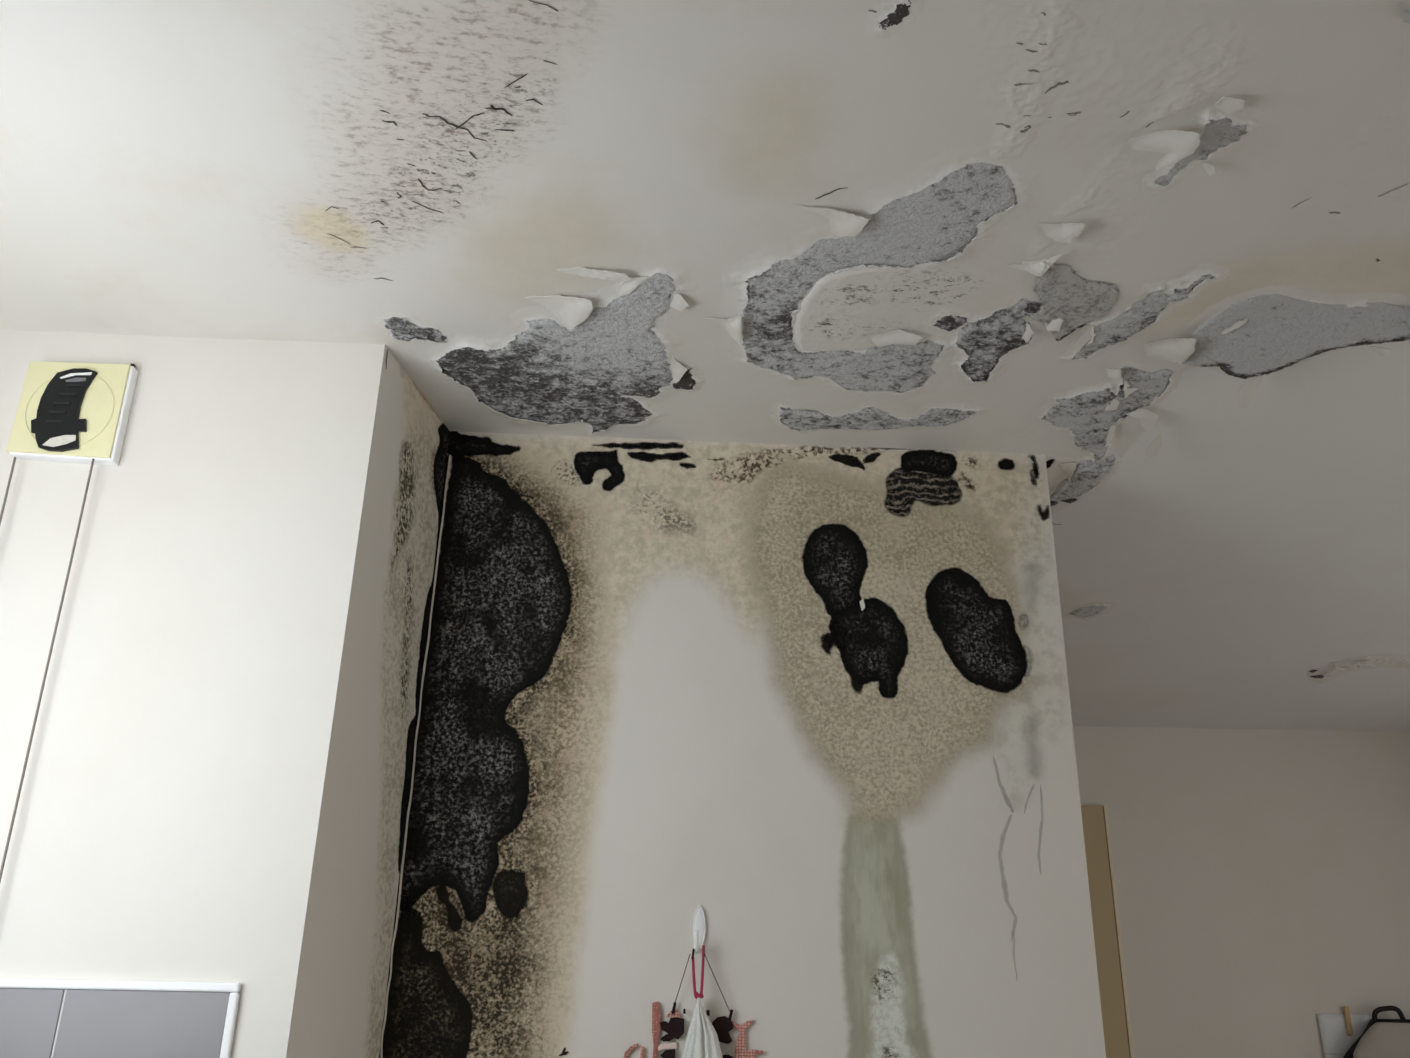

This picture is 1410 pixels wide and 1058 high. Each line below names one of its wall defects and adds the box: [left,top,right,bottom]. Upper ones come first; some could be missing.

peeling [1128,96,1271,191]
peeling [375,144,1410,507]
leakage [627,452,690,462]
leakage [635,442,684,450]
leakage [829,454,865,470]
leakage [863,452,881,463]
leakage [998,459,1015,470]
leakage [802,524,908,698]
mould [925,567,1032,693]
peeling [1305,654,1410,684]
leakage [350,407,439,1058]
leakage [487,989,507,1014]